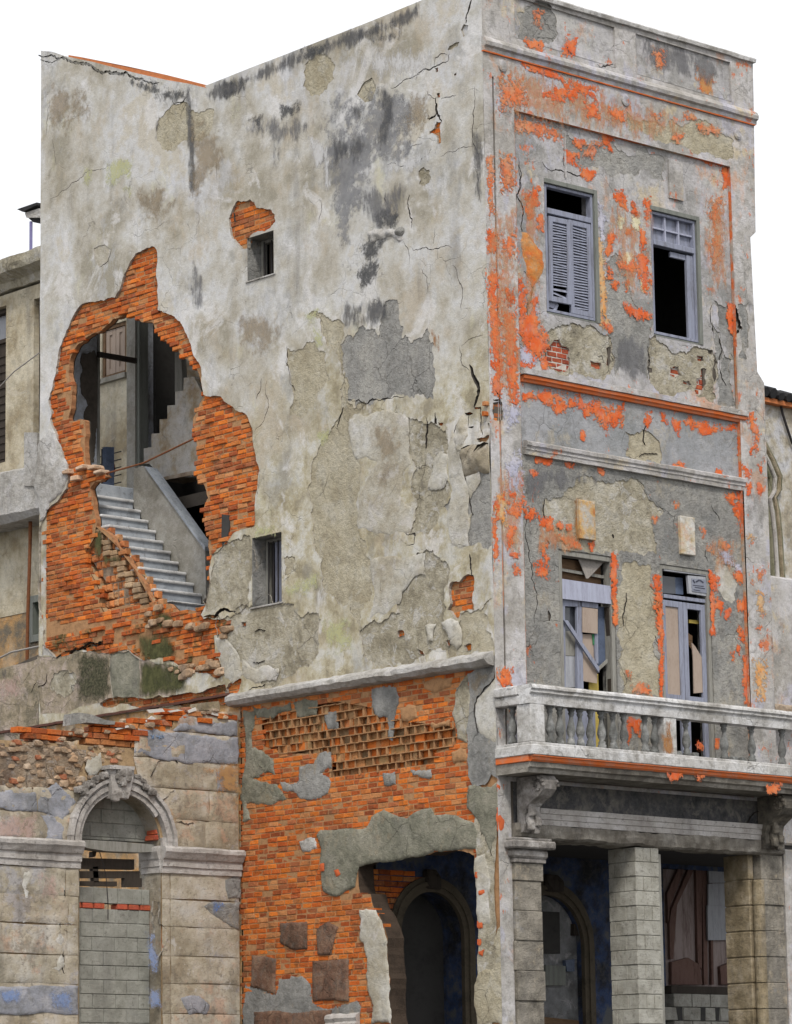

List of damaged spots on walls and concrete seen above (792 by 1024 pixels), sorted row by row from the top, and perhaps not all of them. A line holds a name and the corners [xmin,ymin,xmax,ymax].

crack [38,54,190,104]
spalling [229,199,275,249]
leakage [248,90,429,288]
crack [387,53,481,202]
peeling [652,48,667,69]
spalling [37,246,321,714]
peeling [286,299,494,668]
crack [425,335,502,515]
peeling [467,62,769,705]
peeling [626,717,642,746]
peeling [766,782,782,795]